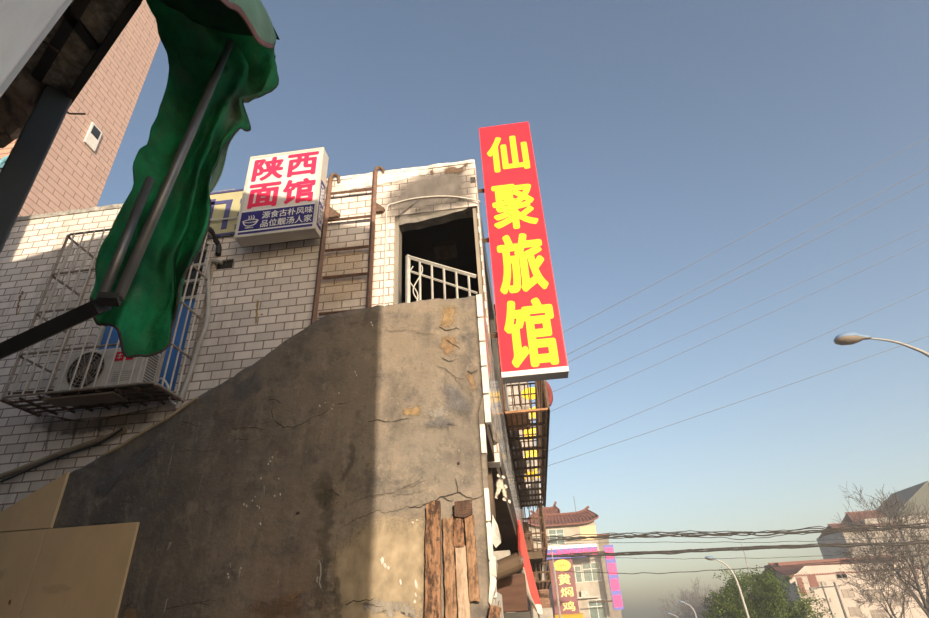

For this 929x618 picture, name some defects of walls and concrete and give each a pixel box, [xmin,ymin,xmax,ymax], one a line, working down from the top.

leakage [342,170,472,214]
spalling [440,306,460,362]
crack [354,477,484,508]